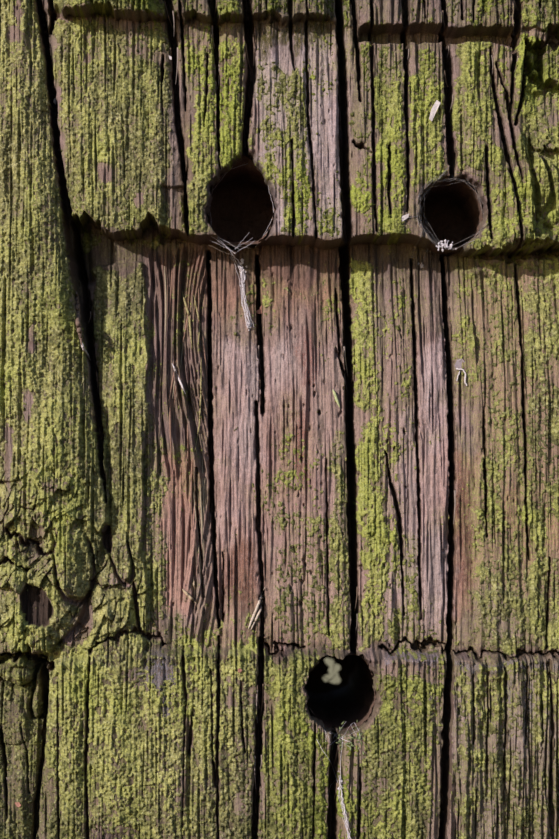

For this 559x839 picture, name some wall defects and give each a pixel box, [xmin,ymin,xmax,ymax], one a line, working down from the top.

crack [0,528,53,572]
crack [0,647,60,839]
crack [36,0,107,504]
crack [84,251,226,839]
crack [241,256,306,839]
crack [325,0,475,655]
crack [378,0,559,839]